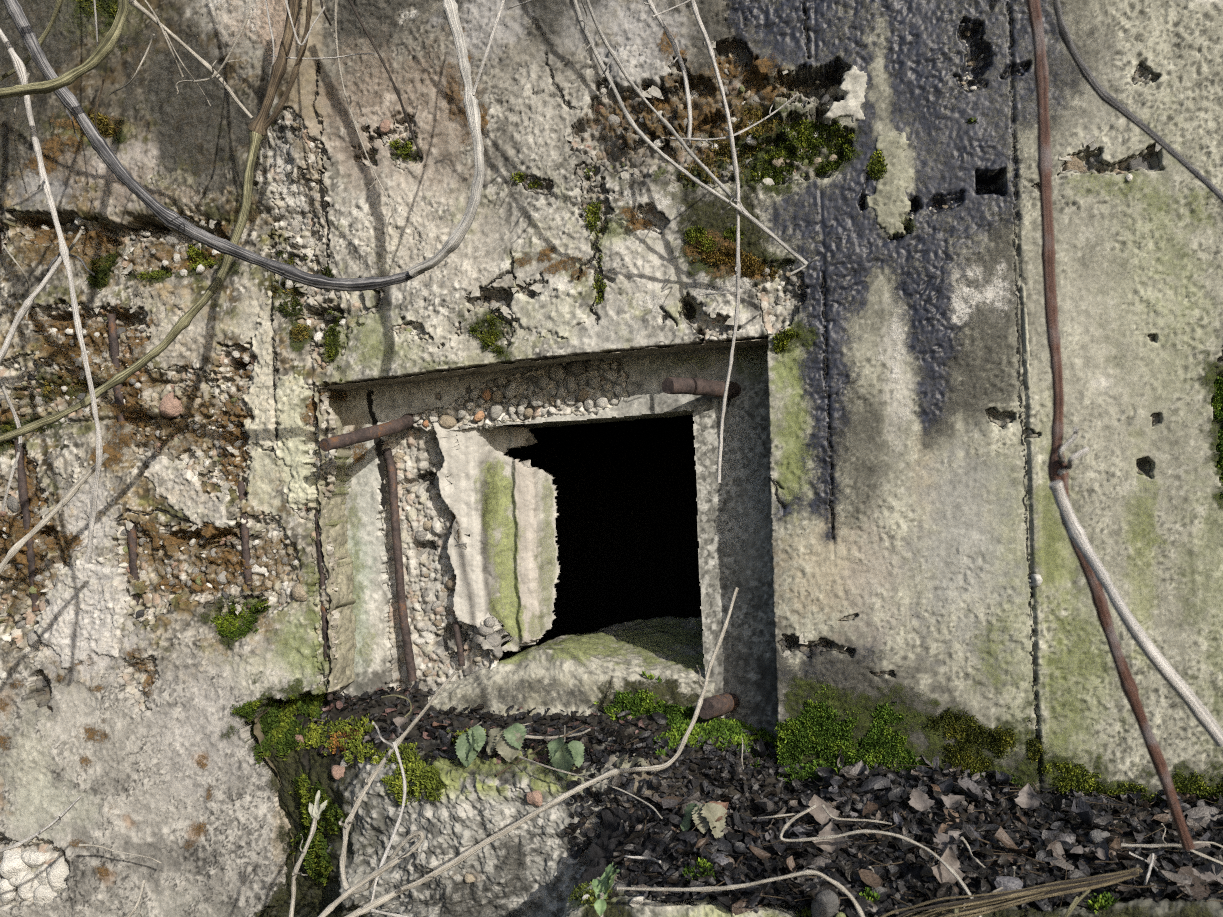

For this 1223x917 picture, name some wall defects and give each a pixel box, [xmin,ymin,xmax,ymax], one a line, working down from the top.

water stain [331,0,425,47]
water stain [522,0,606,46]
crack [804,1,812,59]
corrosion [0,406,87,611]
corrosion [24,303,296,607]
peeling [0,108,385,713]
corrosion [319,413,417,682]
spalling [381,426,503,697]
spalling [564,41,867,302]
crack [821,273,835,538]
water stain [622,0,1091,541]
crack [1008,3,1040,771]